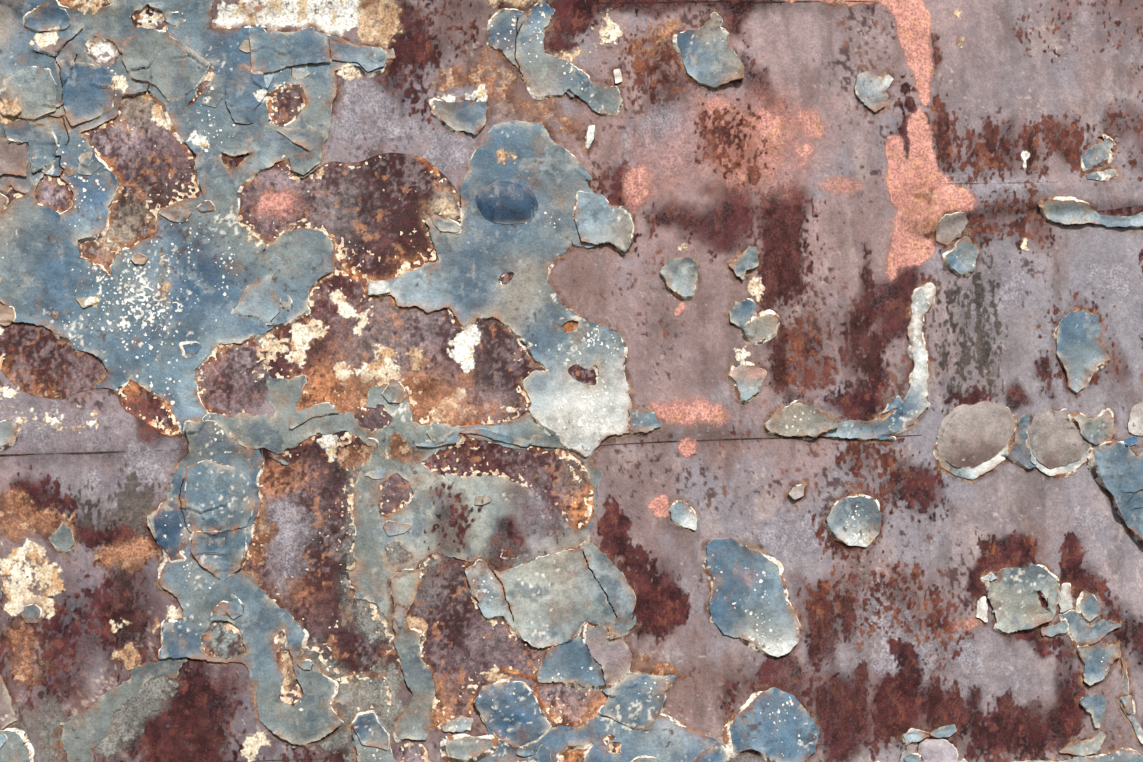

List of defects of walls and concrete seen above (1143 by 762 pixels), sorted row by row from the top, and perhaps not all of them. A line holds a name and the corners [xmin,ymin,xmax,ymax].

corrosion [546,0,936,421]
corrosion [890,74,1143,264]
peeling [1038,195,1143,230]
peeling [0,0,819,762]
peeling [763,282,936,442]
corrosion [0,466,163,762]
corrosion [597,494,691,644]
corrosion [720,432,1086,762]
peeling [899,722,958,762]
peeling [933,408,1143,546]
peeling [974,563,1143,762]
corrosion [1056,532,1143,665]